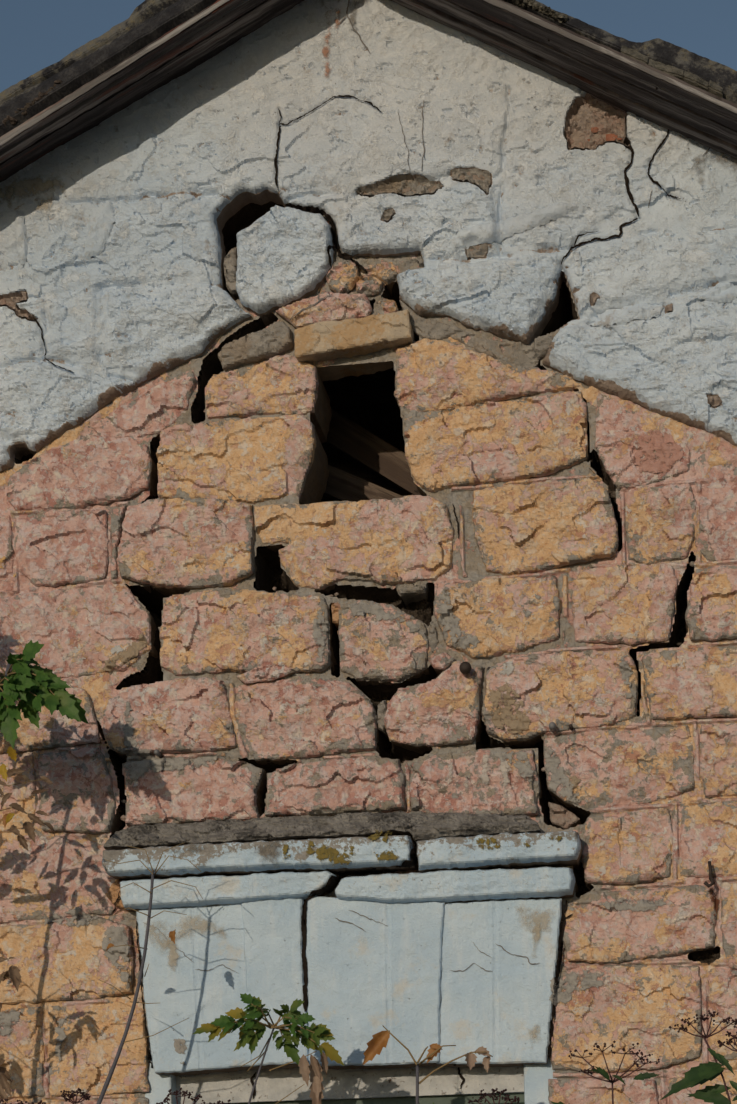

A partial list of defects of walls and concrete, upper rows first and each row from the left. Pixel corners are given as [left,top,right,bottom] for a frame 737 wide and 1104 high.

spalling [0,292,35,321]
crack [191,95,425,424]
spalling [357,168,491,197]
spalling [566,93,630,150]
crack [540,129,681,336]
crack [584,399,623,552]
crack [117,585,166,690]
crack [255,545,438,763]
crack [629,552,696,717]
crack [102,737,127,836]
crack [476,715,591,826]
crack [301,844,418,1012]